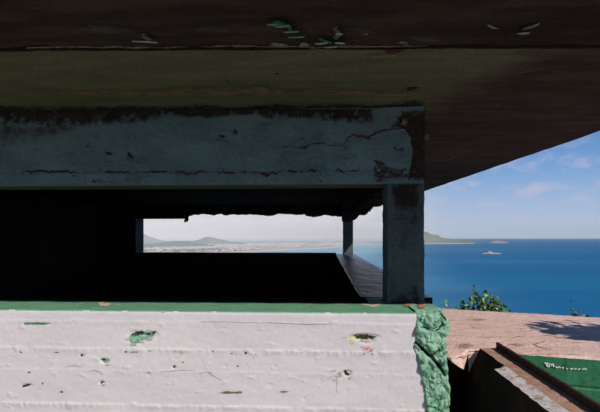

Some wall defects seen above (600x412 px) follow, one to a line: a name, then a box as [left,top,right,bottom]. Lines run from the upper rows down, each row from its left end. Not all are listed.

peeling [27,34,186,49]
peeling [200,21,422,49]
water stain [0,101,422,134]
crack [283,122,409,148]
spalling [124,329,156,353]
spalling [341,334,377,344]